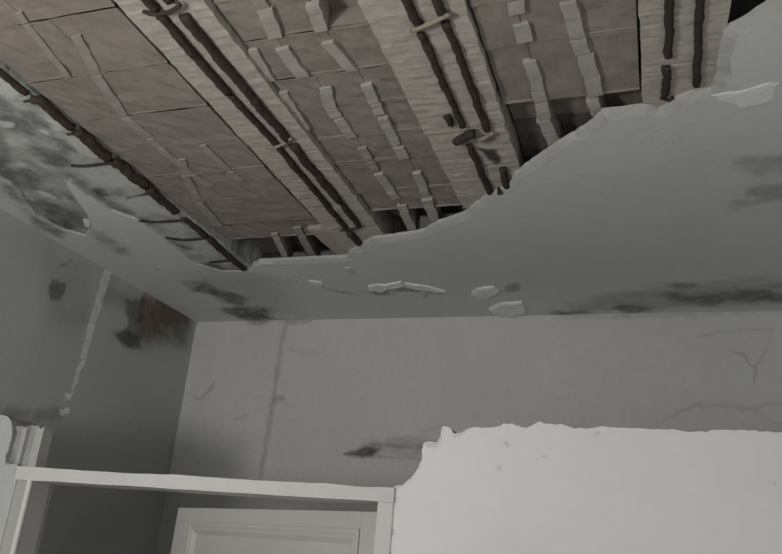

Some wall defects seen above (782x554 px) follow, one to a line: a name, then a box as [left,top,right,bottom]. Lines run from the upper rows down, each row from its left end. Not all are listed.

flaking render [0,0,782,276]
flaking render [368,281,445,298]